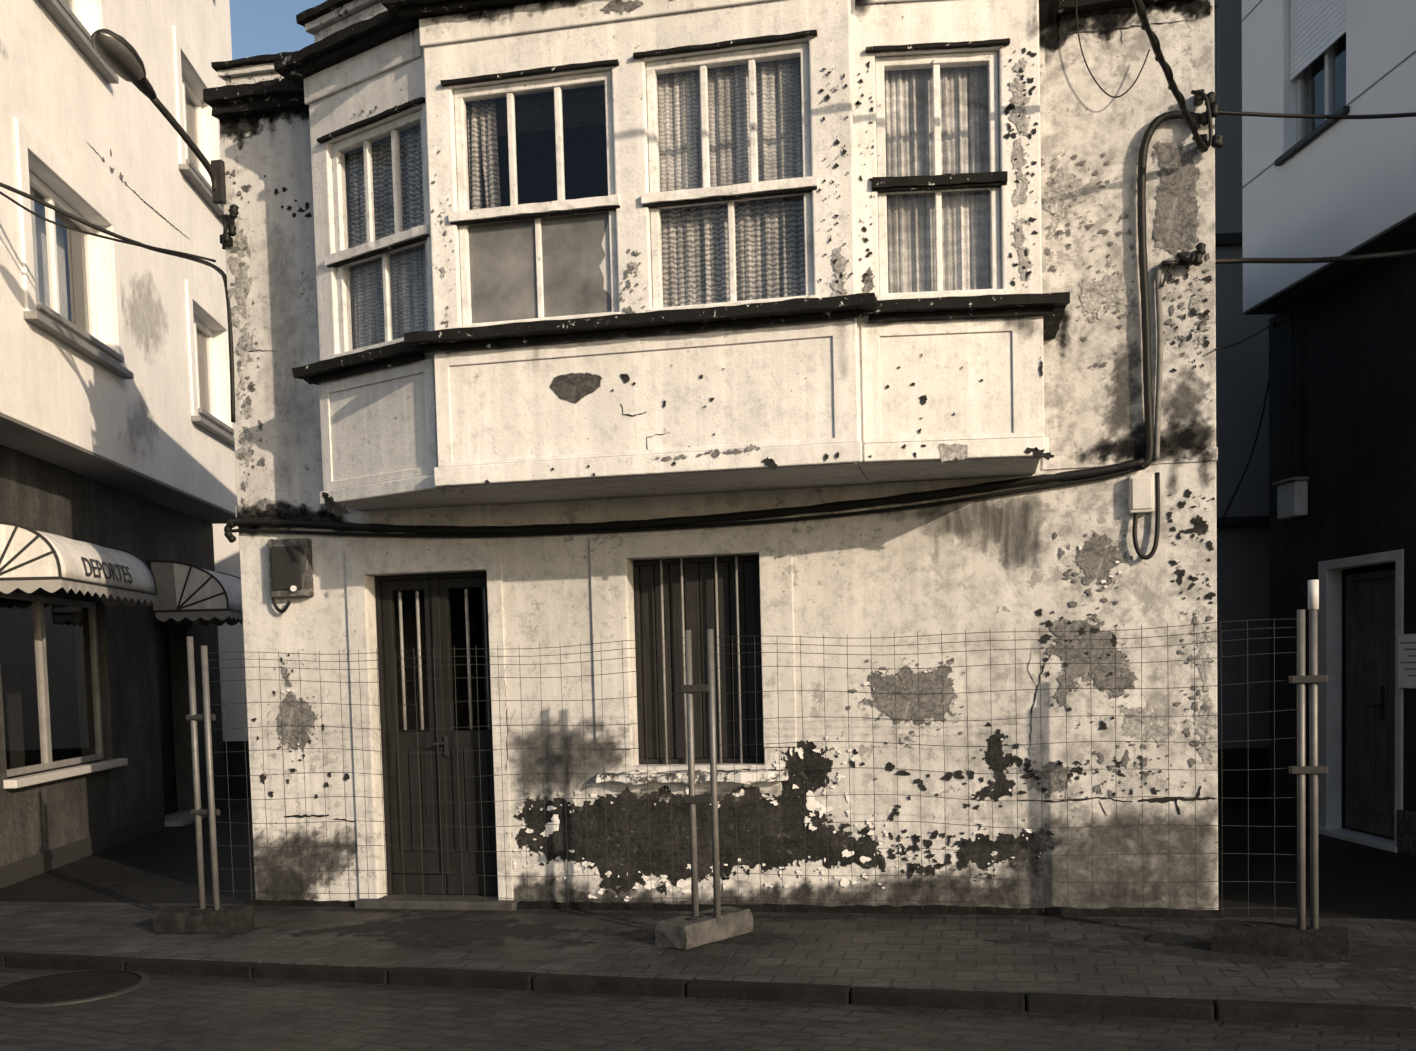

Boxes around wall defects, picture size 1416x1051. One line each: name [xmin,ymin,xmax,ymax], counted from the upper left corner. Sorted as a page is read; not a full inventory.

leakage [1033,0,1212,61]
leakage [219,109,309,150]
peeling [1004,48,1137,341]
peeling [1151,141,1212,372]
leakage [1058,311,1070,356]
spalling [550,372,636,403]
leakage [1080,351,1216,490]
peeling [251,654,324,797]
leakage [512,720,628,796]
peeling [510,489,1218,902]
leakage [253,832,357,901]